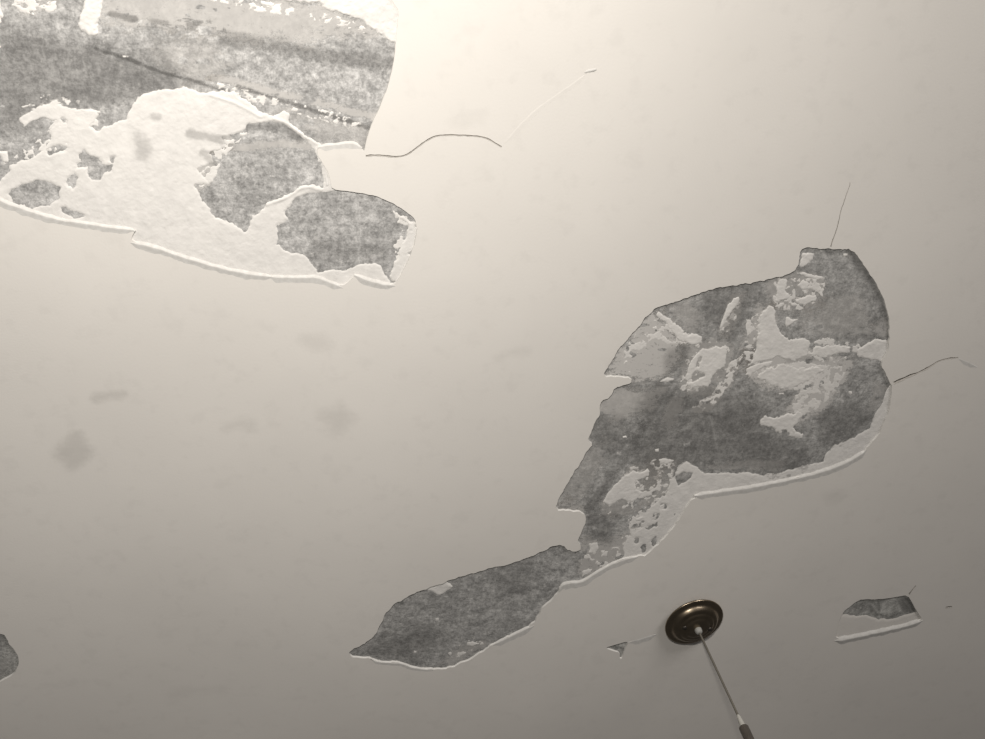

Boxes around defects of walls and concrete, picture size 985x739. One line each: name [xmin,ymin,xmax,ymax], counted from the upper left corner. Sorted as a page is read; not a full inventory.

peeling [0,0,417,289]
crack [366,68,597,158]
crack [894,357,977,384]
peeling [349,247,892,671]
peeling [0,634,19,682]
peeling [834,596,923,644]